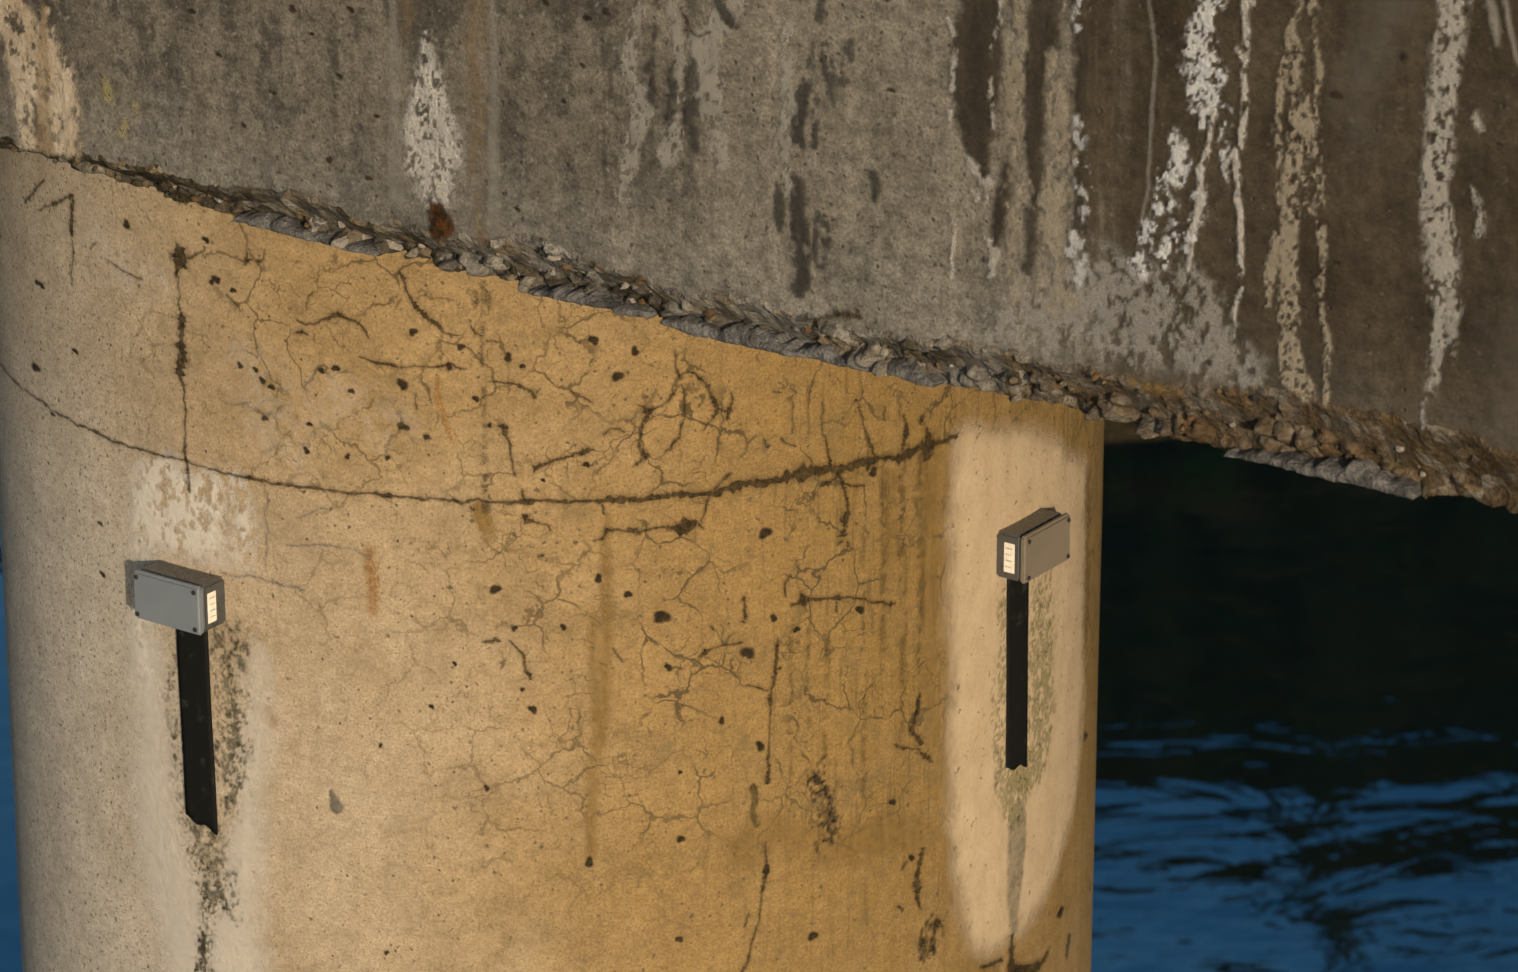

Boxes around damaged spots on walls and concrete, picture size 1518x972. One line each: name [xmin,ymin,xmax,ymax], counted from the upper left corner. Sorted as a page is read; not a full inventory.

damp [0,0,82,158]
damp [405,32,461,206]
corrosion [427,200,454,240]
damp [947,0,1332,407]
damp [1420,0,1465,427]
damp [1472,188,1484,237]
crack [0,177,980,558]
spalling [0,136,1518,514]
crack [483,638,532,680]
crack [672,580,896,785]
crack [897,847,943,943]
crack [980,933,1071,972]